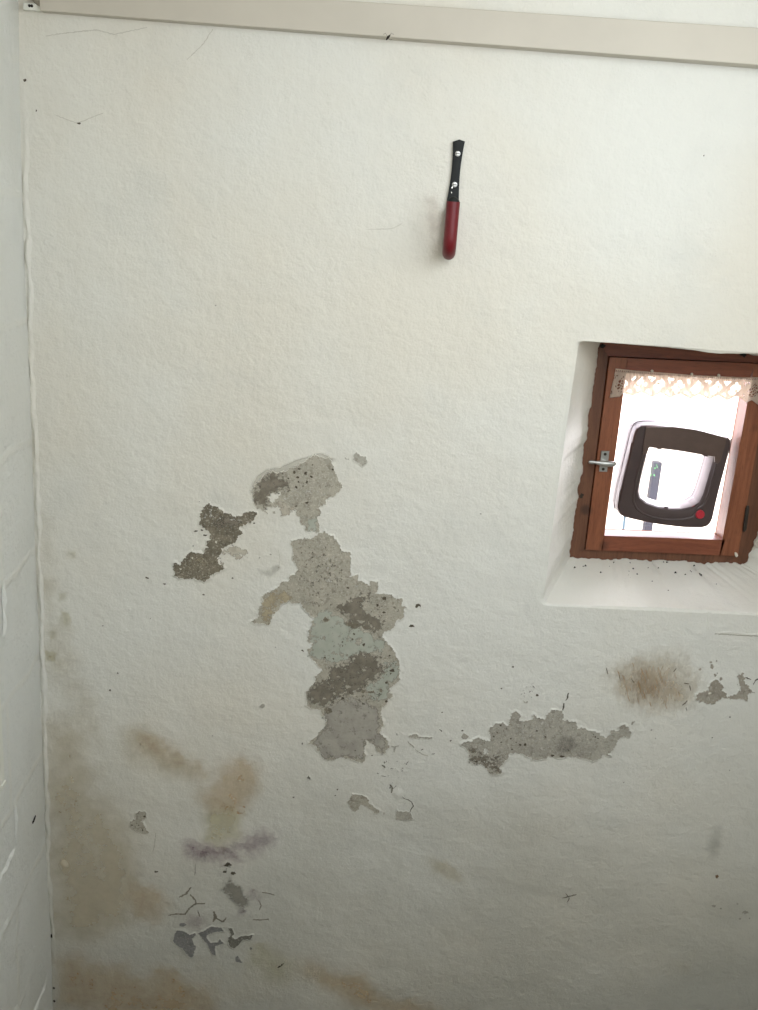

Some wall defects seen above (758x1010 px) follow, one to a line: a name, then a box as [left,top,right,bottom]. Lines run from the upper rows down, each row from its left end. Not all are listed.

flaking render [345,450,368,468]
flaking render [171,454,421,793]
flaking render [694,660,758,705]
flaking render [458,686,635,777]
flaking render [346,793,414,822]
crack [168,864,226,922]
damp [223,862,247,907]
peeling [170,923,255,970]